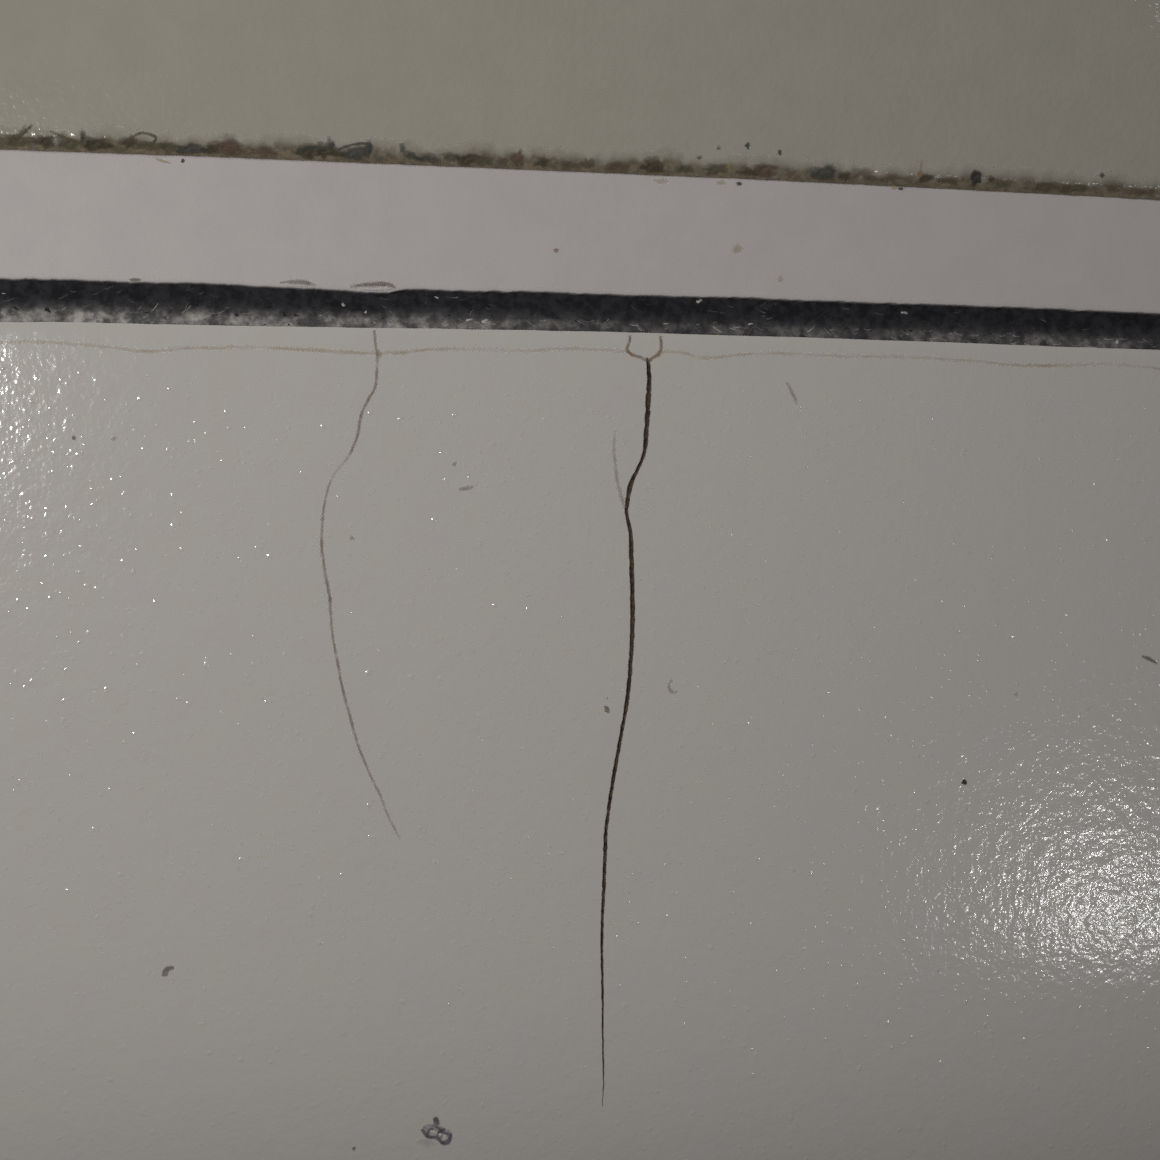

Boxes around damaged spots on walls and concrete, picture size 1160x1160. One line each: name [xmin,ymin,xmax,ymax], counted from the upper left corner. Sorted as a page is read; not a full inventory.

crack [600,335,662,1102]